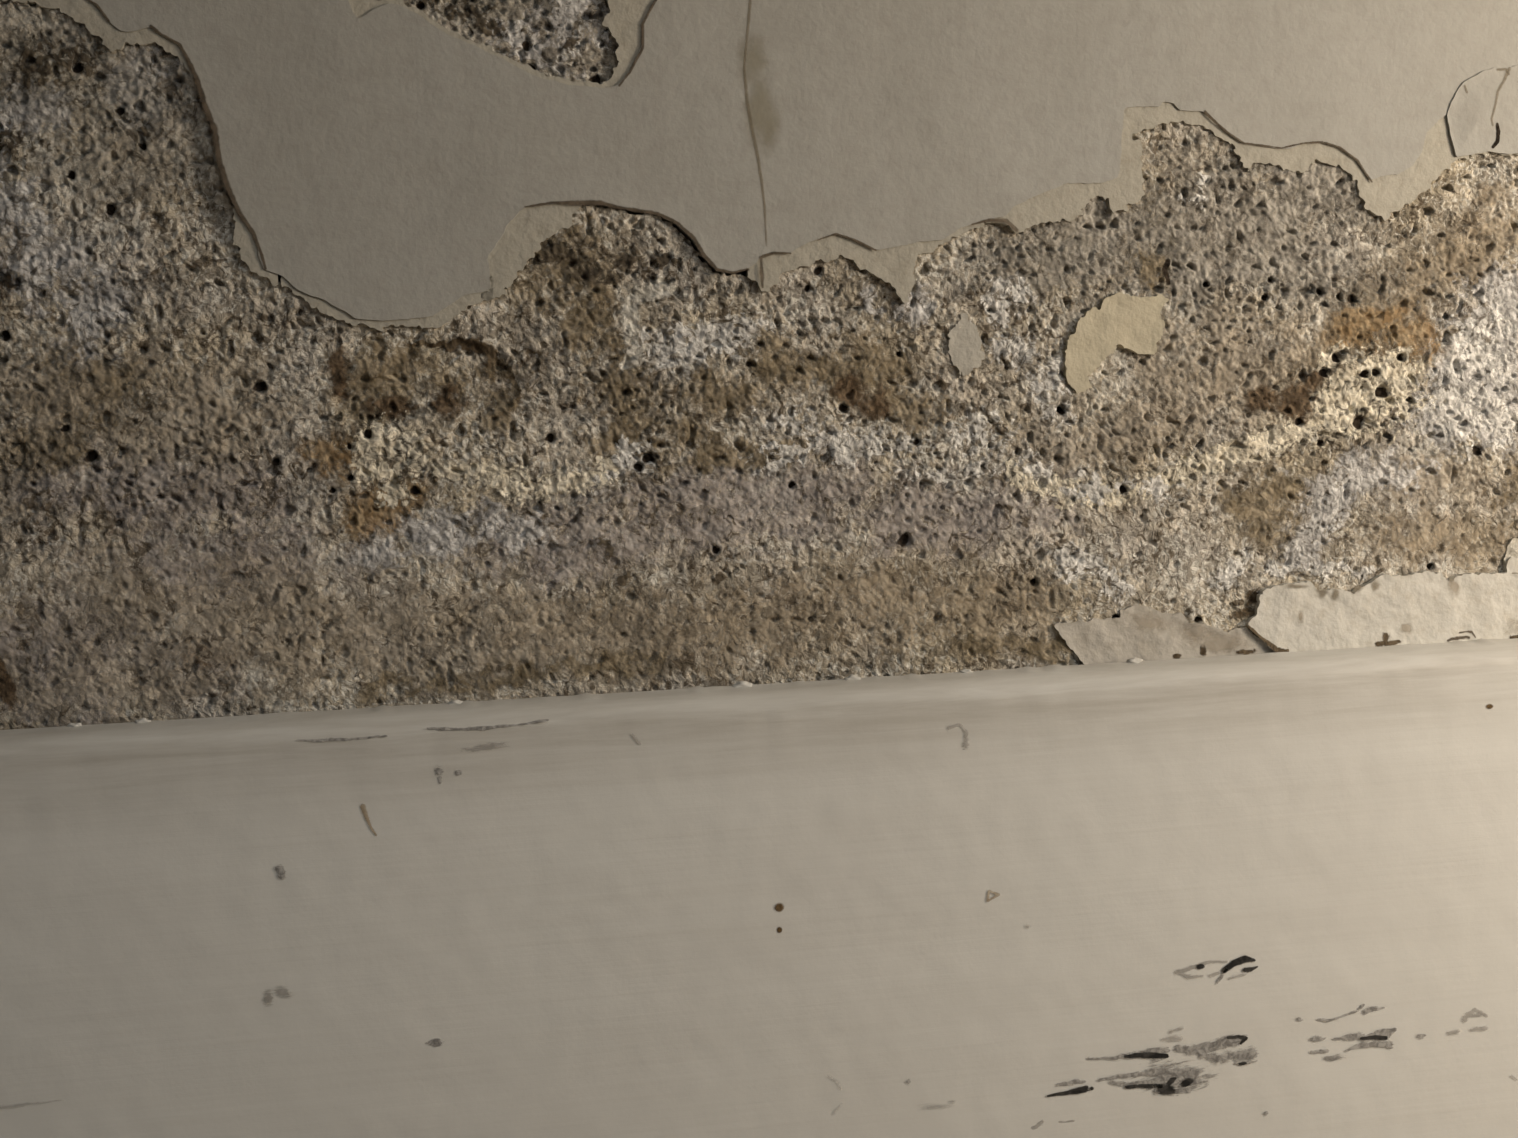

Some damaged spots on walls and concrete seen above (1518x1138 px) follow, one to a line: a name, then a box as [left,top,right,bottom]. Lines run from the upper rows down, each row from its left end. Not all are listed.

crack [525,0,877,288]
spalling [0,0,1518,730]